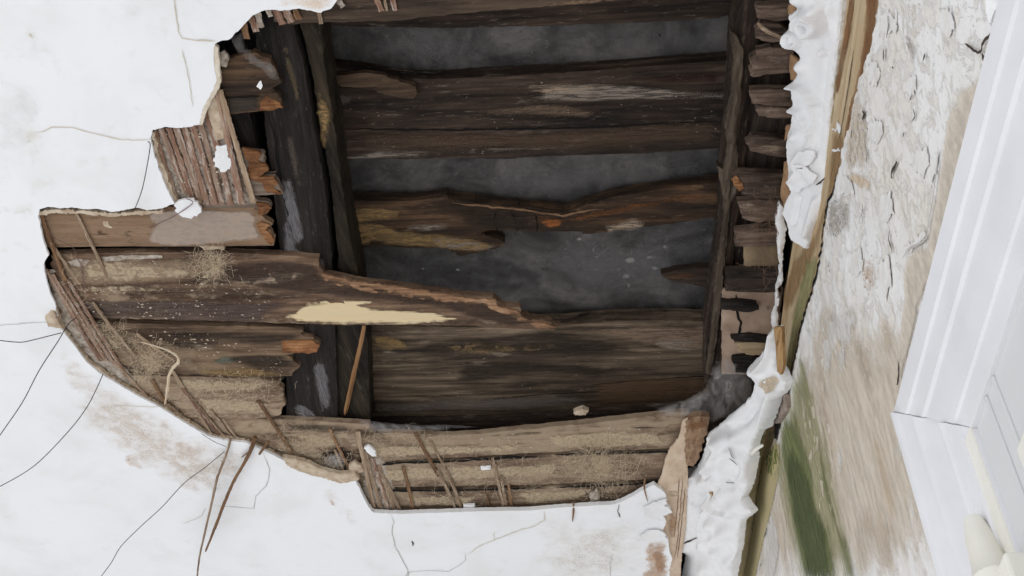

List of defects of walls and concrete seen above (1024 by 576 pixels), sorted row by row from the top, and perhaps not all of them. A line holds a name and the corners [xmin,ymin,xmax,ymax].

crack [174,0,212,106]
crack [35,127,149,141]
spalling [39,207,164,228]
peeling [286,301,456,325]
flaking render [780,222,793,325]
peeling [888,80,978,384]
spalling [56,307,360,483]
crack [186,457,270,523]
crack [392,518,417,576]
crack [443,512,545,572]
flaking render [639,417,688,576]
damp [744,313,924,576]